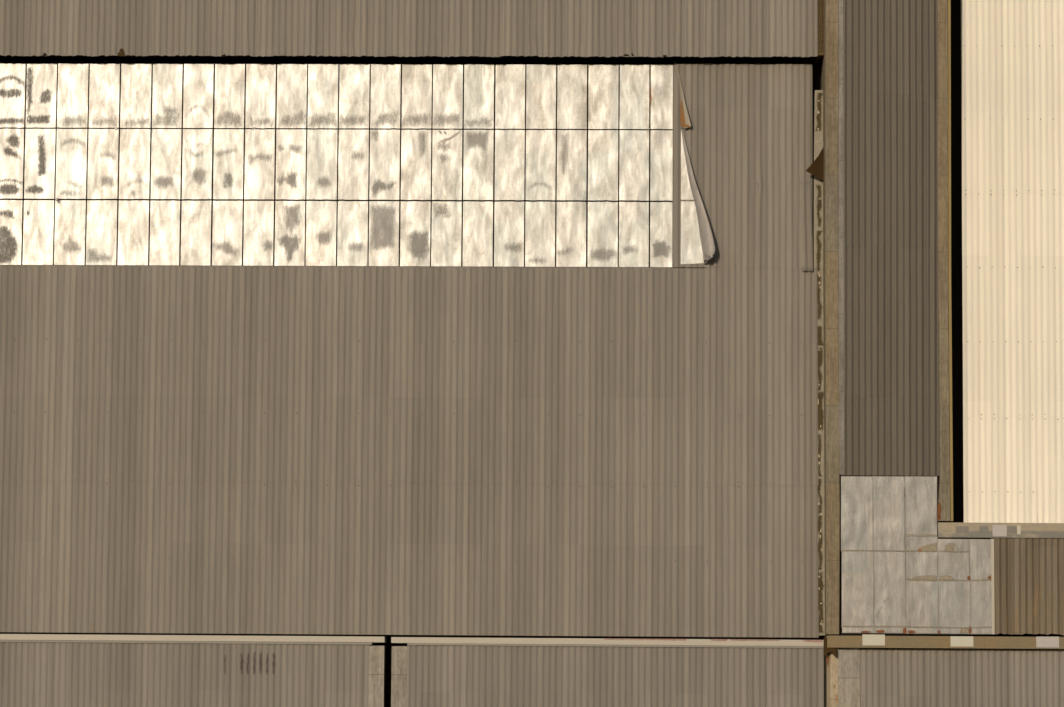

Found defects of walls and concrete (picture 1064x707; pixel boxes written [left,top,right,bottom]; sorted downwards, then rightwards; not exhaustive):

peeling [674,61,715,264]